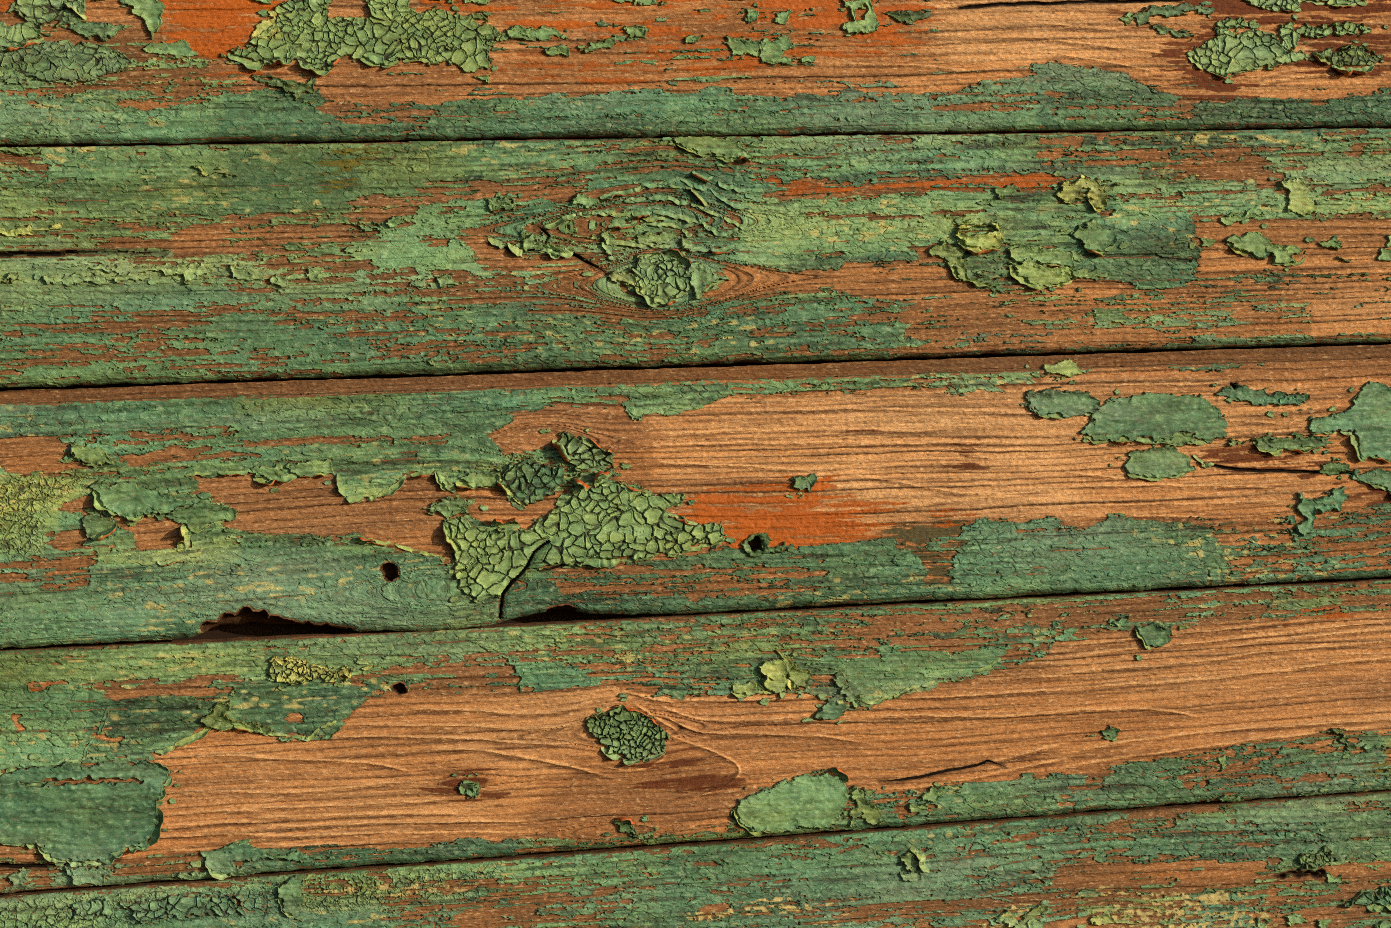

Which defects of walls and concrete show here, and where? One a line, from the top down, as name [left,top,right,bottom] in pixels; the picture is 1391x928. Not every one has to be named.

peeling [0,0,199,85]
peeling [220,0,650,105]
peeling [1119,0,1388,84]
peeling [485,136,760,310]
peeling [927,167,1129,298]
peeling [1019,359,1391,550]
peeling [56,427,794,603]
crack [498,540,563,617]
peeling [0,690,337,928]
peeling [585,693,671,767]
peeling [728,767,887,836]
crack [888,760,1005,781]